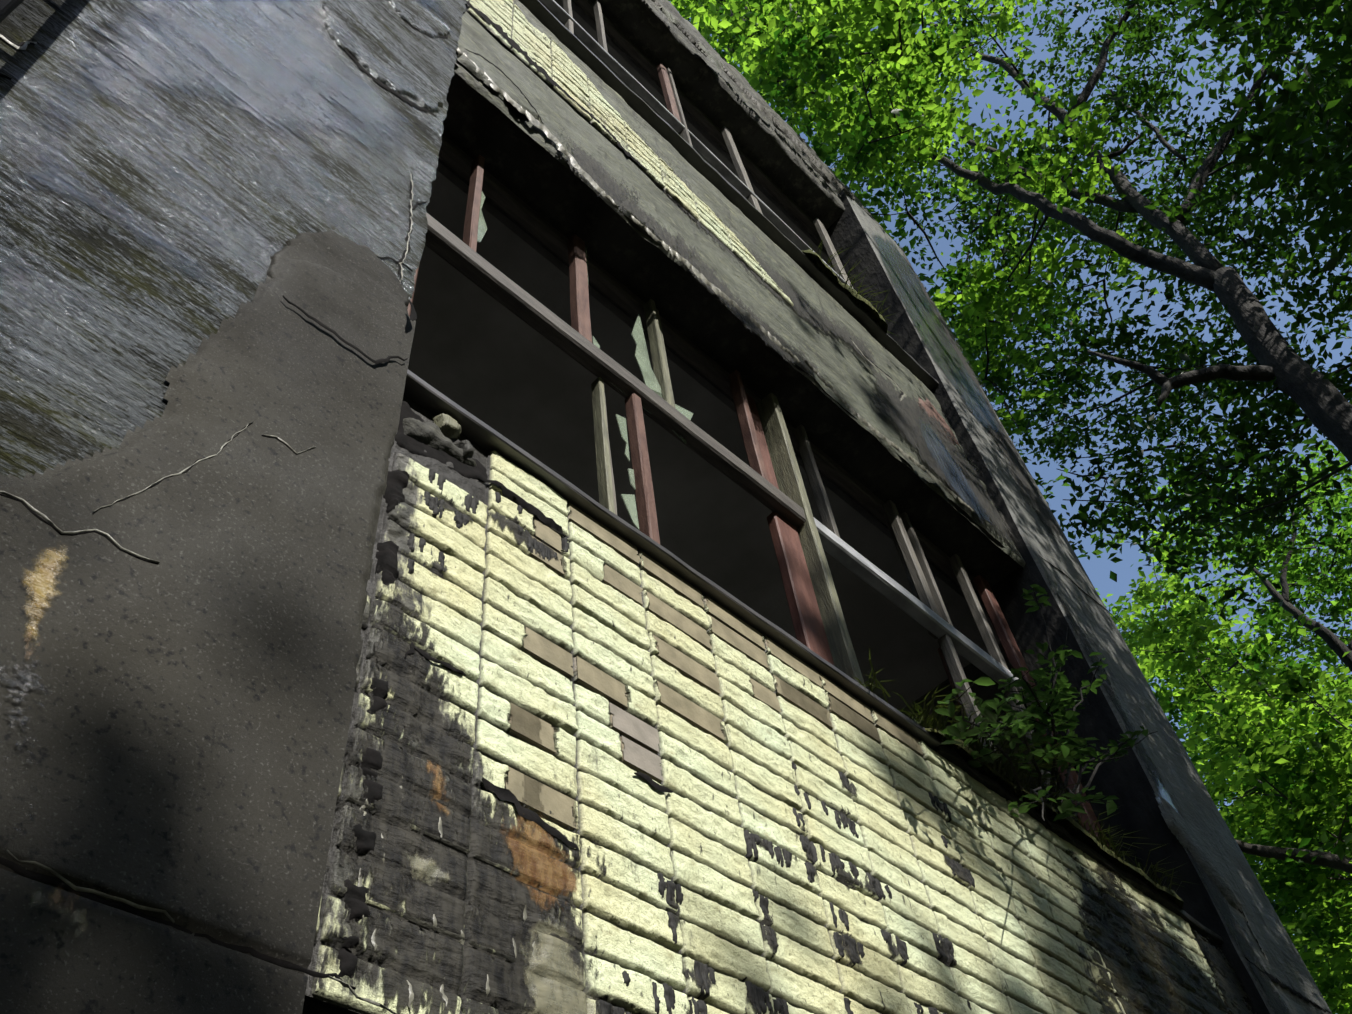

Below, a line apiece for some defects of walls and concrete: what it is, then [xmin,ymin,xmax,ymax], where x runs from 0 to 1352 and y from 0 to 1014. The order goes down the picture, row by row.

water stain [13,0,416,310]
spalling [388,0,974,513]
crack [0,422,316,564]
spalling [375,541,399,585]
spalling [383,470,409,512]
peeling [532,518,564,574]
peeling [524,627,664,781]
peeling [569,502,925,756]
peeling [506,766,577,829]
crack [0,850,397,1014]
spalling [336,879,371,978]
water stain [1065,838,1290,1014]